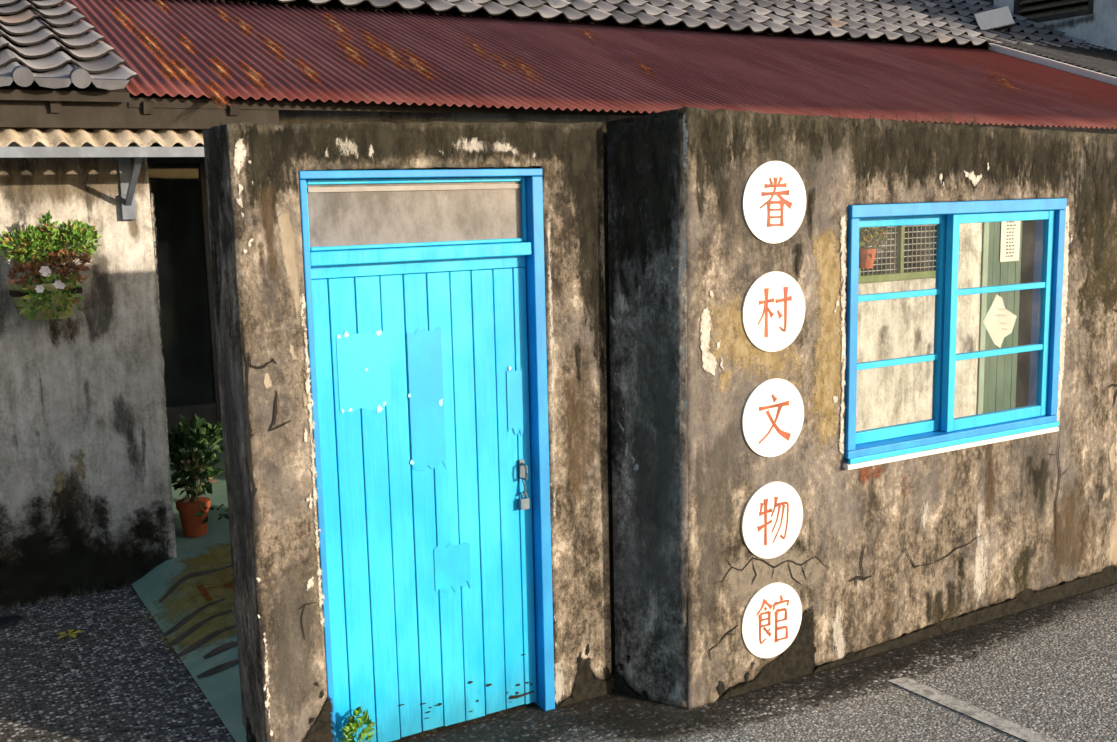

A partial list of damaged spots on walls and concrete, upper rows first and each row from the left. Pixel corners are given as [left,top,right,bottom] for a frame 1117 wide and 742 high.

corrosion [112,7,268,109]
corrosion [214,6,321,83]
corrosion [320,13,437,81]
leakage [208,122,226,326]
leakage [240,105,1117,381]
leakage [0,344,244,610]
crack [242,317,291,577]
leakage [631,322,678,596]
crack [713,546,872,586]
leakage [788,540,811,588]
crack [896,534,981,576]